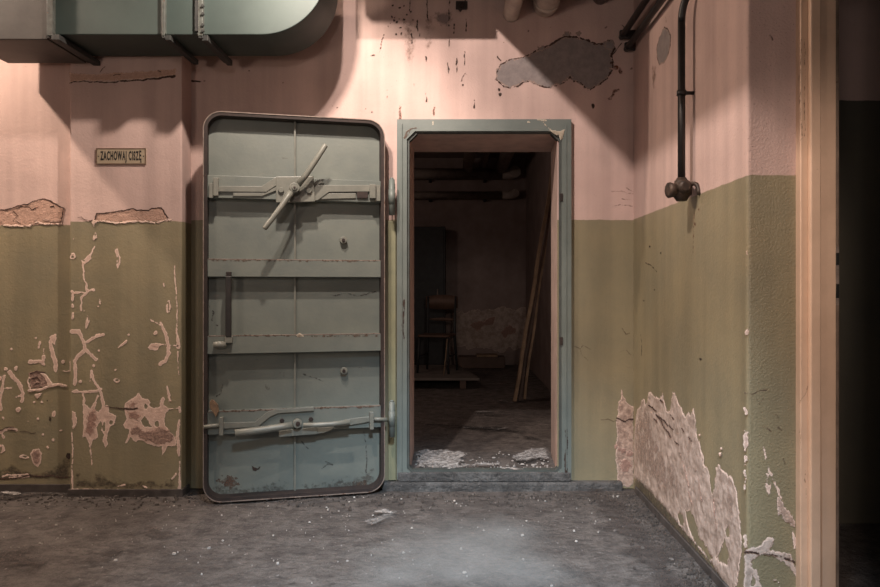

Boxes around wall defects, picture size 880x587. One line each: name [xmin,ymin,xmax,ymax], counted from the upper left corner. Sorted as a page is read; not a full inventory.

crack [69,68,176,84]
spalling [496,31,622,90]
spalling [656,27,671,65]
spalling [0,198,64,227]
peeling [0,207,181,489]
peeling [614,390,796,587]